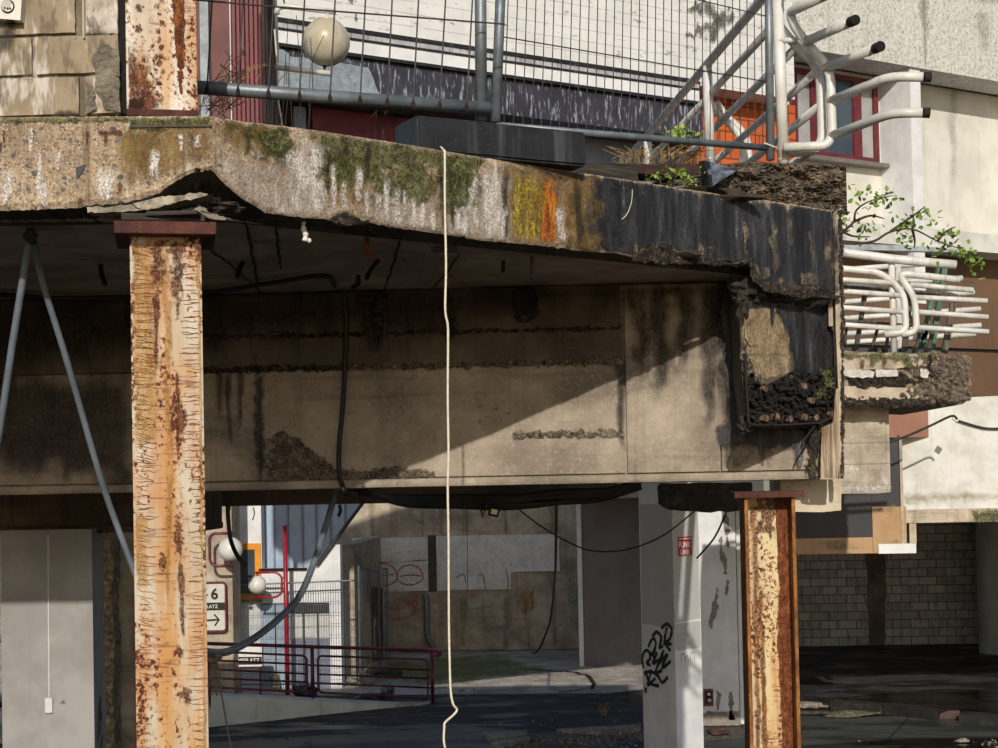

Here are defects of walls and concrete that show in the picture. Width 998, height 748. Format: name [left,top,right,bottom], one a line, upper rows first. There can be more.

rust [128,0,186,109]
efflorescence [29,129,47,206]
crack [85,194,158,209]
water stain [123,127,208,183]
water stain [202,122,847,382]
water stain [0,376,128,480]
water stain [0,300,131,359]
spalling [203,357,625,481]
water stain [627,282,810,468]
spalling [632,242,972,480]
rust [132,239,206,748]
rust [750,498,794,748]